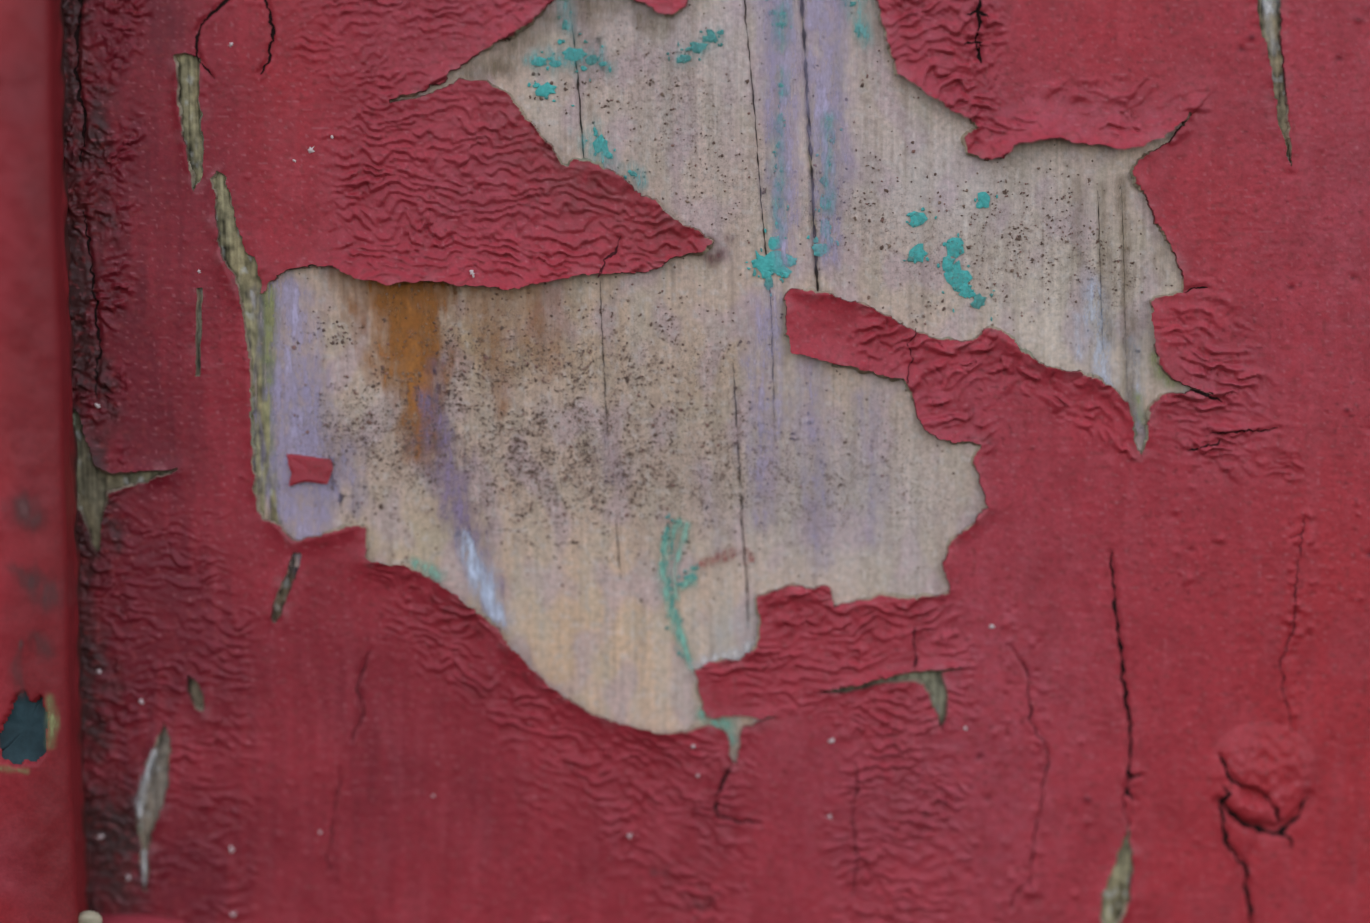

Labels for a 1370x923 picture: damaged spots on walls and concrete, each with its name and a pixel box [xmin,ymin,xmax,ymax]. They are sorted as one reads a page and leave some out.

peeling [1257,0,1290,162]
rust [368,280,447,460]
peeling [177,0,1201,763]
peeling [0,691,50,764]
peeling [136,726,170,889]
peeling [1101,834,1132,923]
crack [1110,553,1141,825]
crack [1221,817,1254,921]